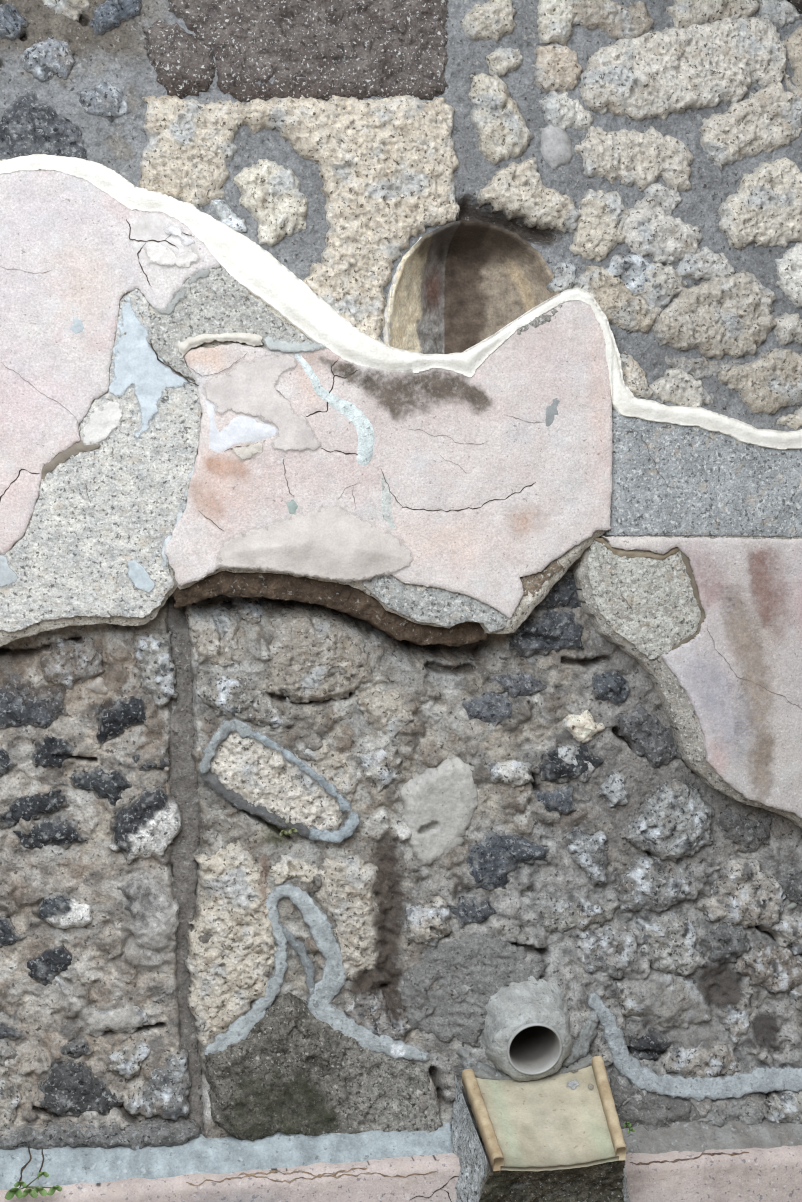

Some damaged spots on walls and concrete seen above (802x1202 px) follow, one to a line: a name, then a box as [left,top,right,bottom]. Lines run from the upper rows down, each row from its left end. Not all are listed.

crack [126,220,194,286]
crack [3,364,79,427]
spalling [0,212,508,646]
crack [277,352,536,530]
crack [0,469,39,501]
spalling [587,538,706,660]
crack [707,629,802,709]
water stain [352,839,402,1024]
crack [186,1168,459,1202]
crack [630,1152,749,1165]